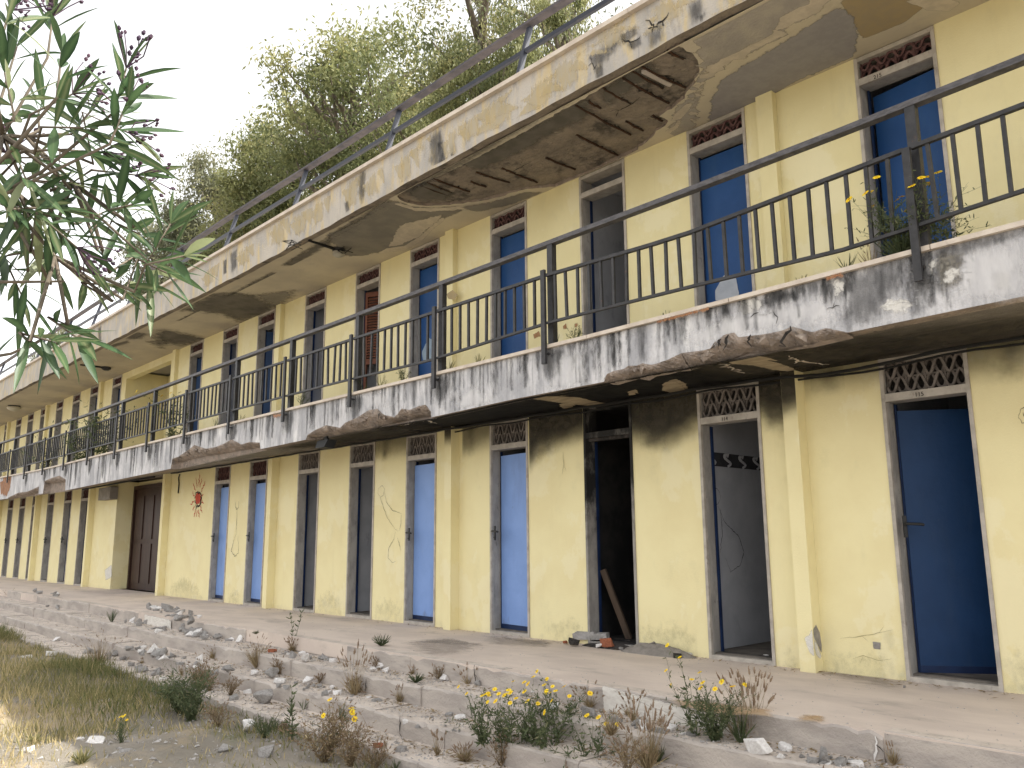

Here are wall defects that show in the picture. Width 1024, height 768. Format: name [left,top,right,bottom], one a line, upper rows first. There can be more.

peeling [708,8,859,121]
spalling [327,40,699,256]
water stain [706,299,747,322]
spalling [604,275,853,395]
water stain [761,290,799,309]
water stain [822,265,898,318]
water stain [697,317,1024,380]
water stain [910,241,991,304]
spalling [307,394,431,438]
water stain [44,429,214,486]
spalling [172,440,260,462]
peeling [805,626,822,658]